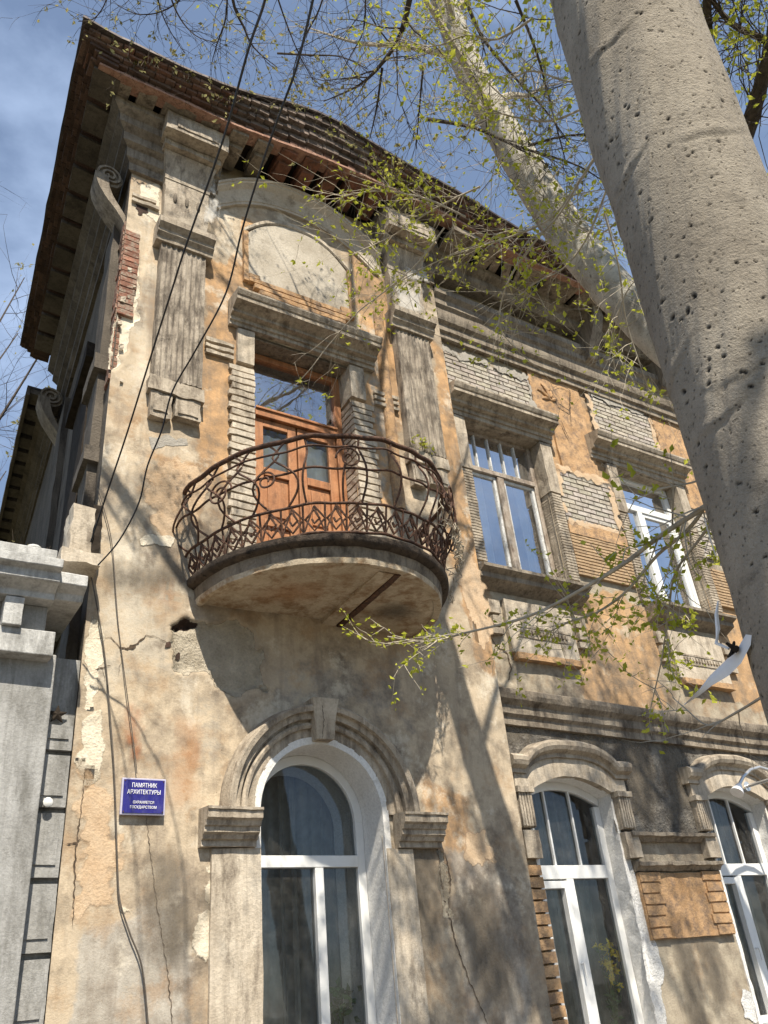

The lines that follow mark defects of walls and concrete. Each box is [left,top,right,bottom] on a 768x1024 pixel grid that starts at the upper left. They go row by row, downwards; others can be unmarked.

spalling [104,221,141,391]
crack [96,635,166,677]
flaking render [165,618,268,697]
peeling [71,617,130,920]
crack [437,849,488,1024]